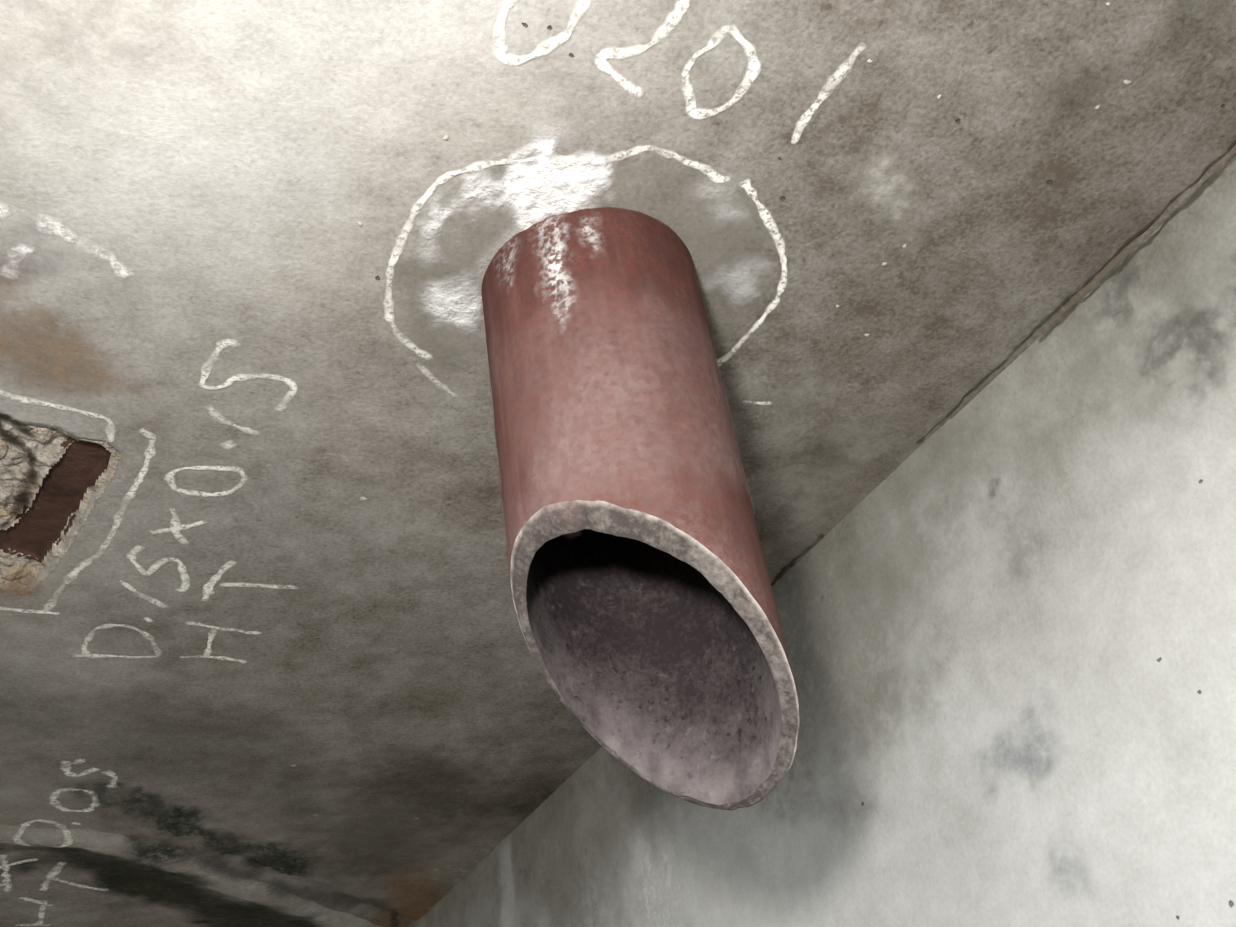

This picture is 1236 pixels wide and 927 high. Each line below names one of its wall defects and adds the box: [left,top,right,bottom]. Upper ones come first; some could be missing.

water stain [423,139,612,285]
water stain [409,261,482,353]
spalling [0,418,122,593]
water stain [624,768,661,815]
water stain [0,813,392,927]